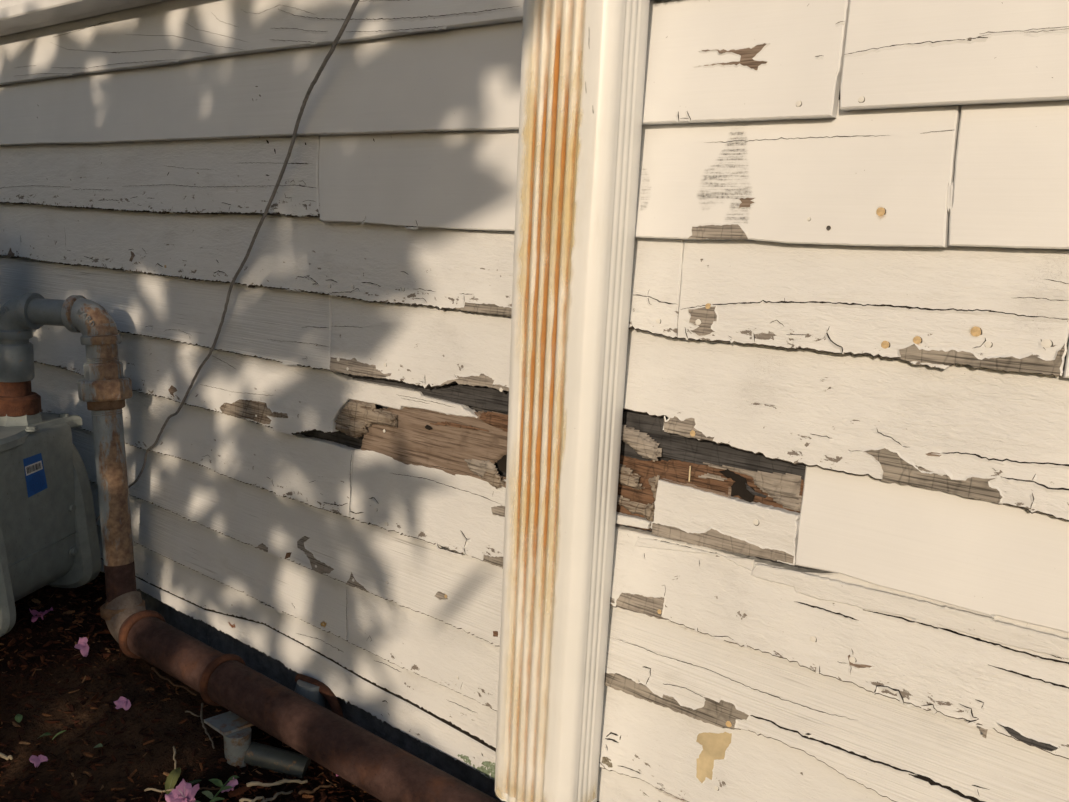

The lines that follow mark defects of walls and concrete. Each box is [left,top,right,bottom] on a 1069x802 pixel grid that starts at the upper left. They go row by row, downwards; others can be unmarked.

peeling [693,42,771,72]
crack [815,27,1069,60]
corrosion [515,27,579,586]
peeling [688,304,719,337]
peeling [897,342,1067,376]
peeling [219,398,289,425]
spalling [719,469,755,502]
peeling [862,446,1004,504]
peeling [651,522,795,565]
peeling [615,591,667,620]
peeling [604,671,751,785]
peeling [996,721,1060,753]